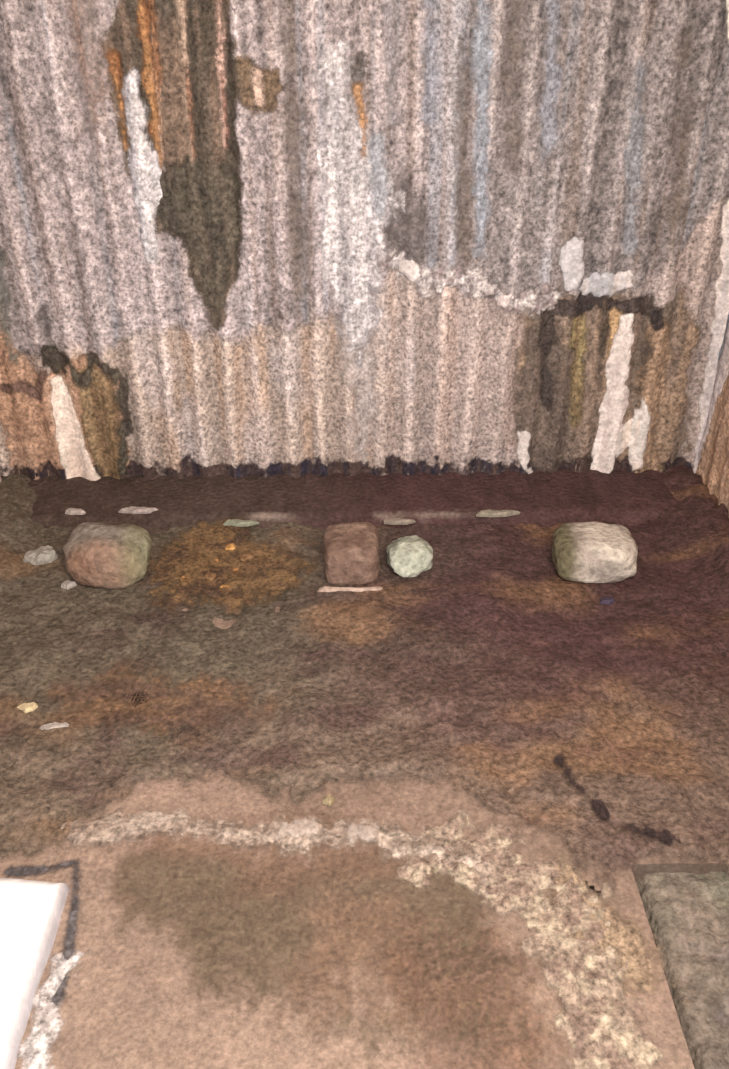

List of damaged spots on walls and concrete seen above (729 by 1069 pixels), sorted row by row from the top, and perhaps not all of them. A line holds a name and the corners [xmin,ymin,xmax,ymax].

spalling [103,0,284,330]
peeling [0,247,133,481]
peeling [375,204,729,518]